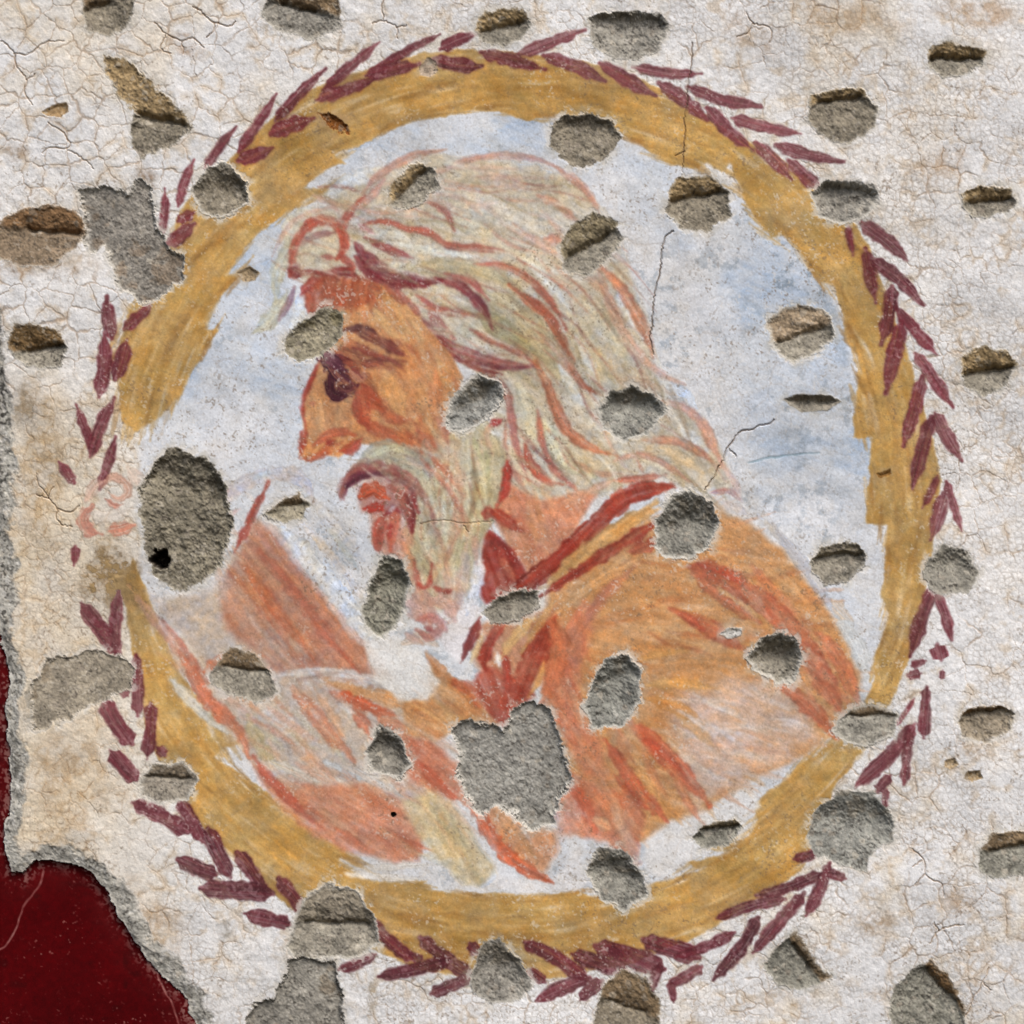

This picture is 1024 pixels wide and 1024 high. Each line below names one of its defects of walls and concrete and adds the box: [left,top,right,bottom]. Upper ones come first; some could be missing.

crack [154,7,236,55]
crack [372,0,407,39]
crack [1,40,94,170]
crack [675,43,694,173]
spalling [76,177,186,306]
crack [649,230,675,355]
crack [705,420,775,489]
spalling [137,447,235,593]
spalling [0,306,215,1024]
spalling [451,701,572,833]
spalling [807,790,896,873]